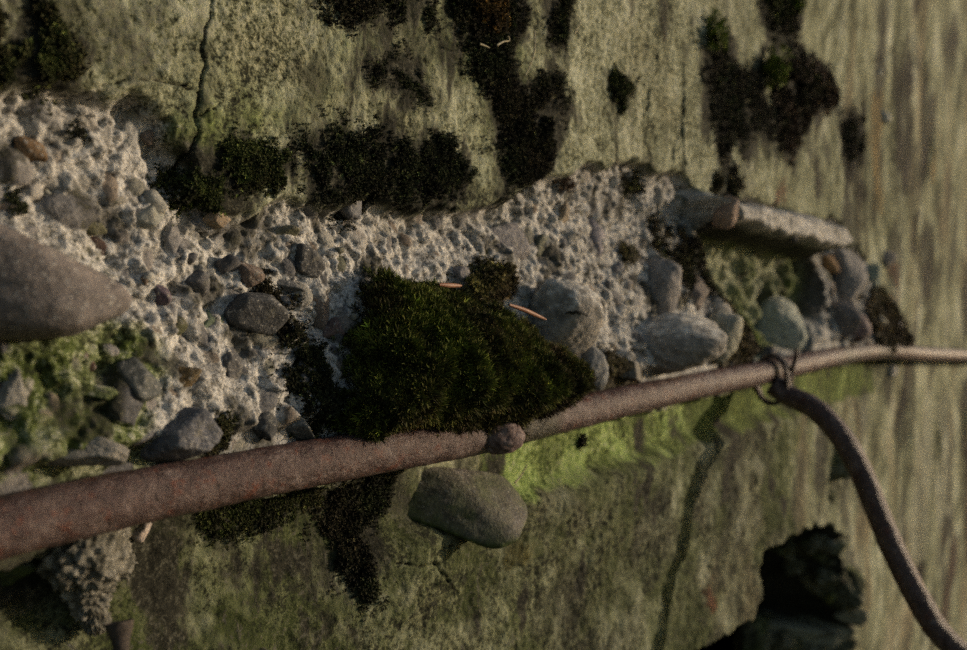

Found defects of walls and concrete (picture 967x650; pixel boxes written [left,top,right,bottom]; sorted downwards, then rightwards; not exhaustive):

crack [139,12,213,175]
spalling [0,84,880,495]
corrosion [522,343,967,444]
spalling [0,547,53,572]
corrosion [0,426,489,561]
corrosion [941,427,967,621]